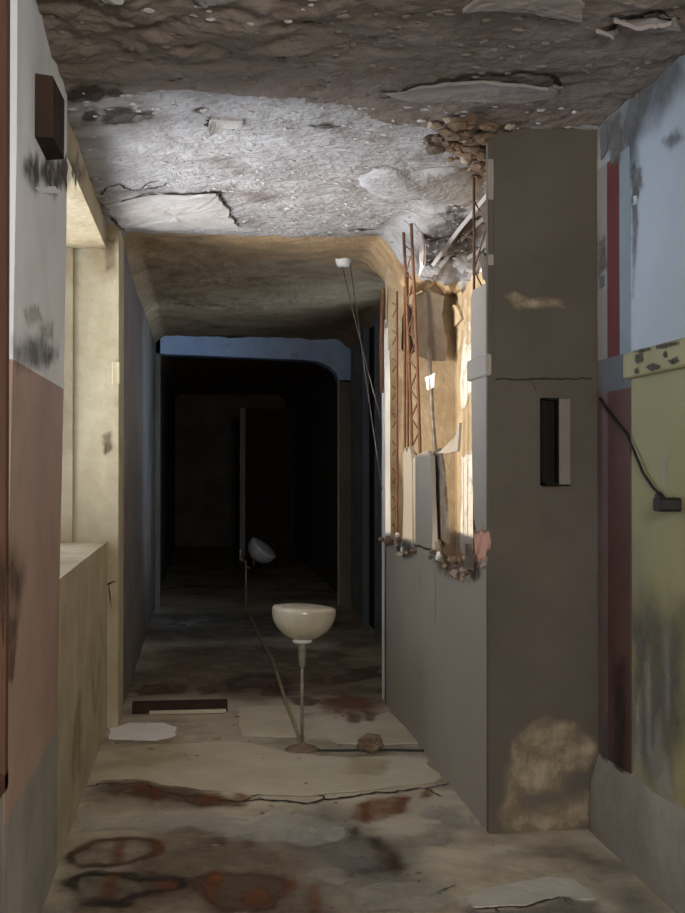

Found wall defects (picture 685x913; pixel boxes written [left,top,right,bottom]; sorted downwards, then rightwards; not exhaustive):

peeling [387,81,564,180]
damp [607,59,681,153]
crack [100,181,239,230]
spalling [424,205,476,266]
peeling [460,319,471,409]
peeling [634,342,679,374]
peeling [435,453,491,581]
damp [105,781,248,805]
crack [129,783,449,806]
damp [64,827,312,913]
damp [319,818,406,904]